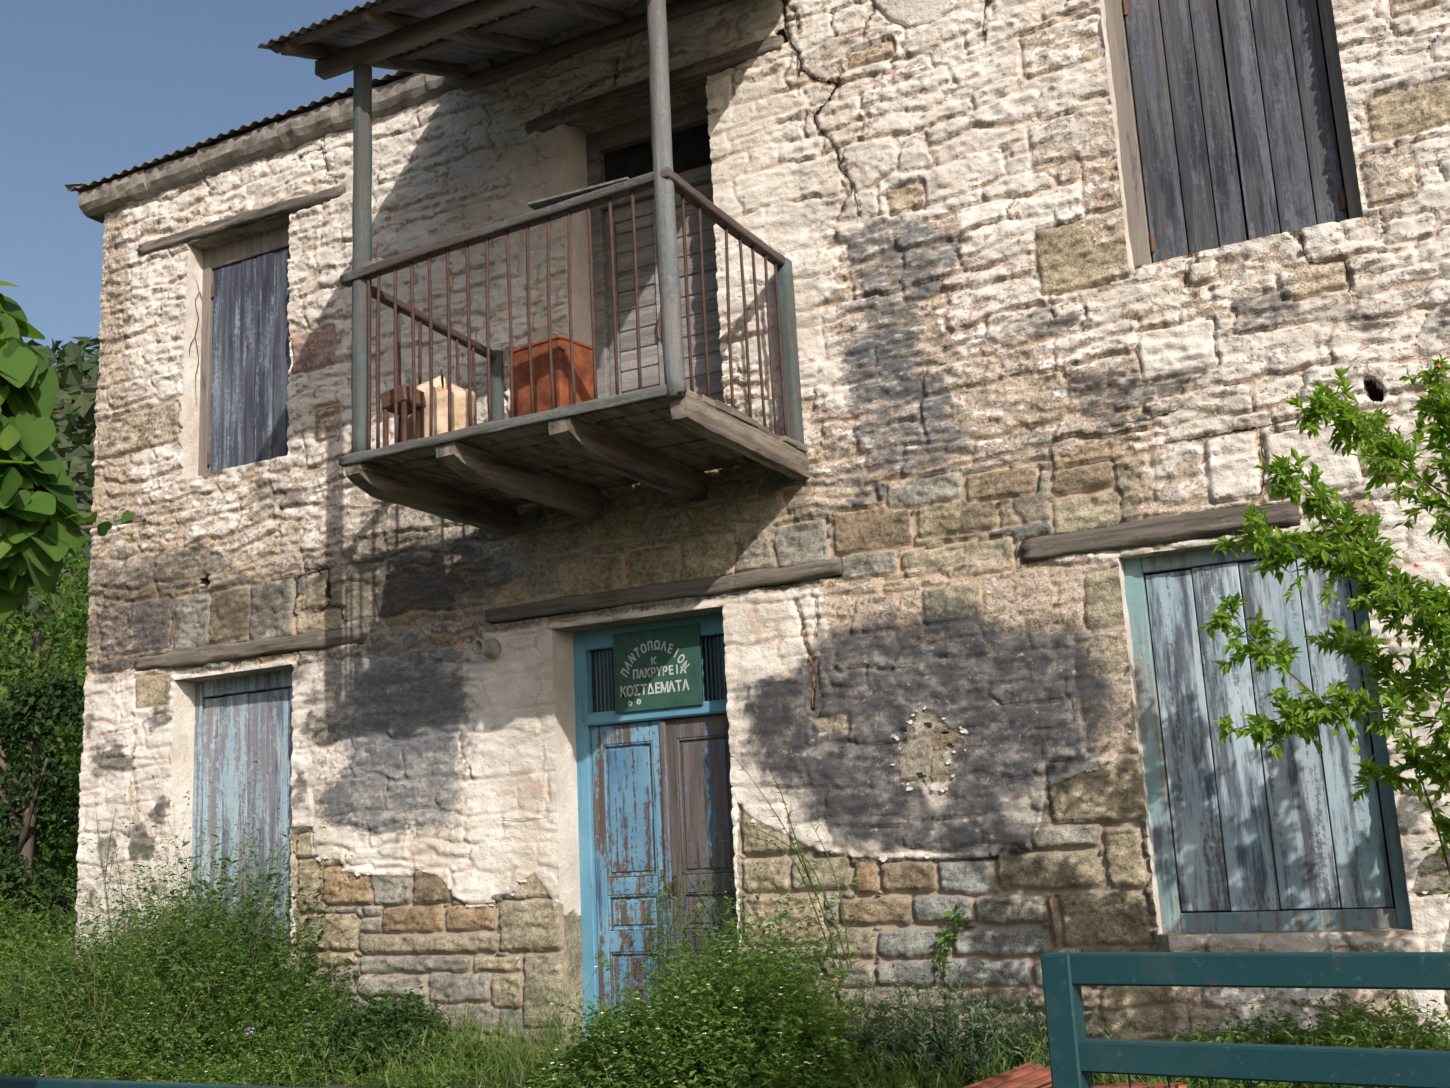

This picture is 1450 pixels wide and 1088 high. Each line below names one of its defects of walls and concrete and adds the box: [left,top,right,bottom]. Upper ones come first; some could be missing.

crack [782,0,875,222]
damp [834,218,971,508]
damp [290,632,474,837]
flaking render [290,826,565,1061]
damp [745,677,801,769]
flaking render [736,706,1176,1073]
damp [927,825,1032,866]